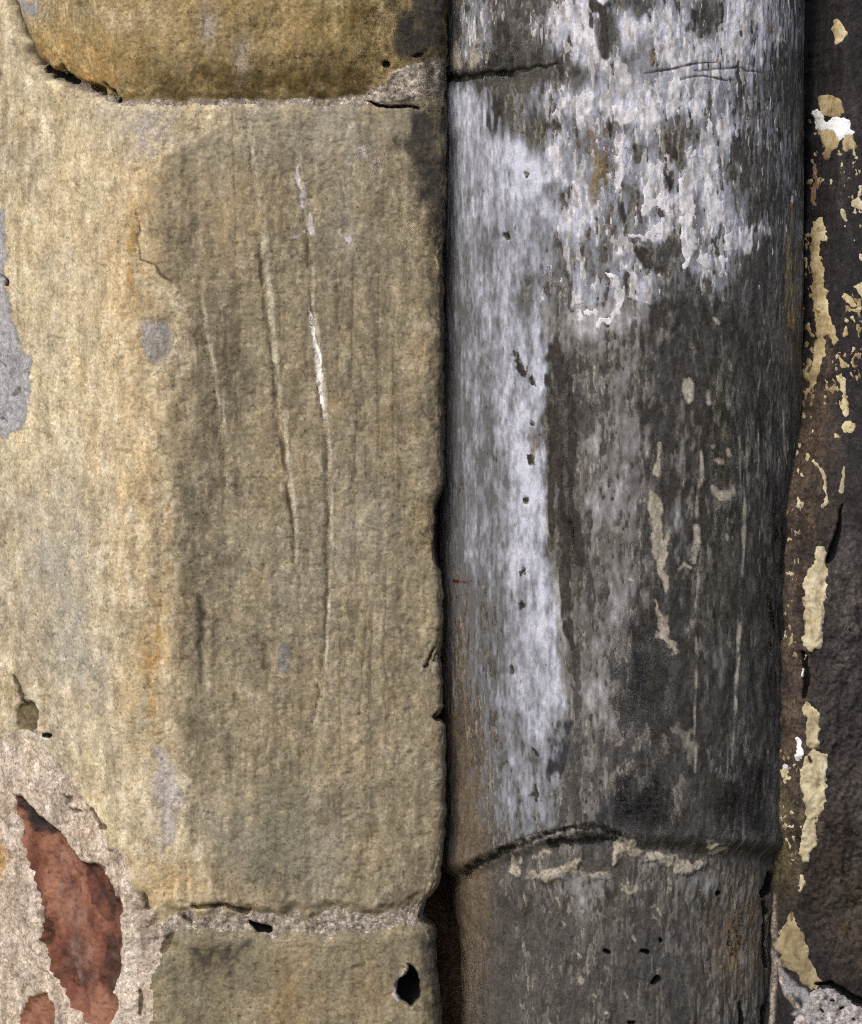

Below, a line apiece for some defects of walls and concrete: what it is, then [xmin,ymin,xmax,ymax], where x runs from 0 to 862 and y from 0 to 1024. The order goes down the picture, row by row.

crack [447,63,557,83]
leakage [448,22,578,83]
leakage [589,0,611,59]
leakage [686,9,699,32]
leakage [486,90,504,133]
leakage [634,246,663,273]
leakage [531,337,584,651]
peeling [424,0,862,1024]
leakage [601,293,785,832]
leakage [549,720,573,774]
crack [464,825,622,876]
spalling [15,795,123,1024]